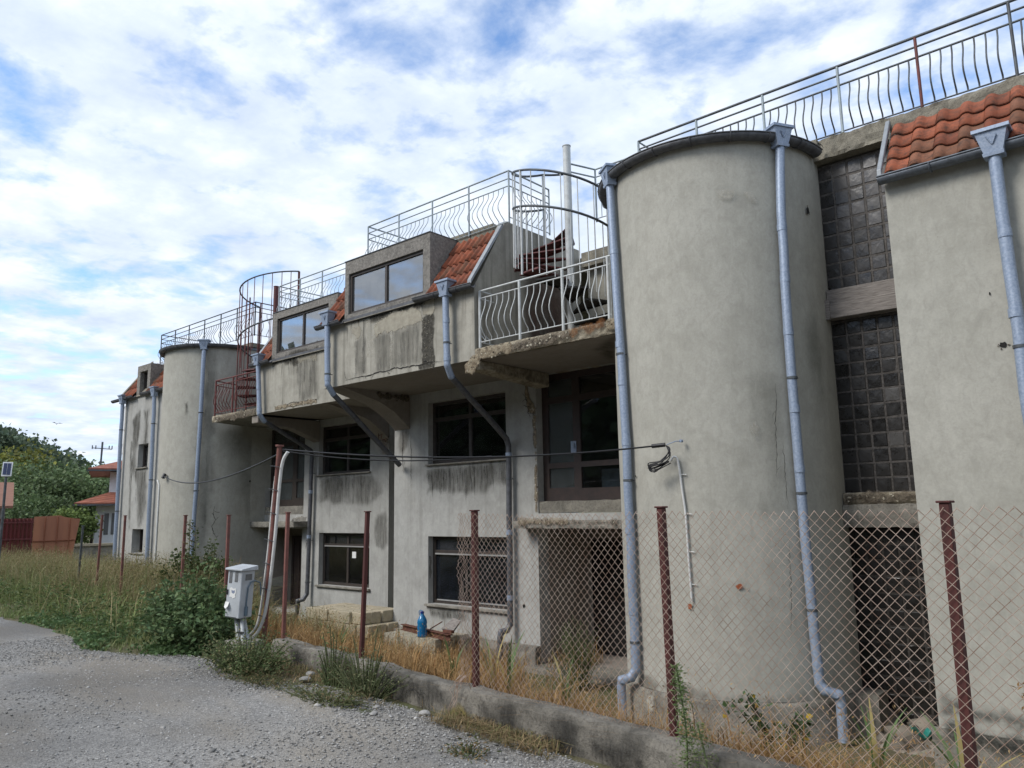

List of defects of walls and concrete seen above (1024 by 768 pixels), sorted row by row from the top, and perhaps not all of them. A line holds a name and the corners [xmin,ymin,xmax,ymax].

leakage [356,299,435,371]
spalling [465,331,569,374]